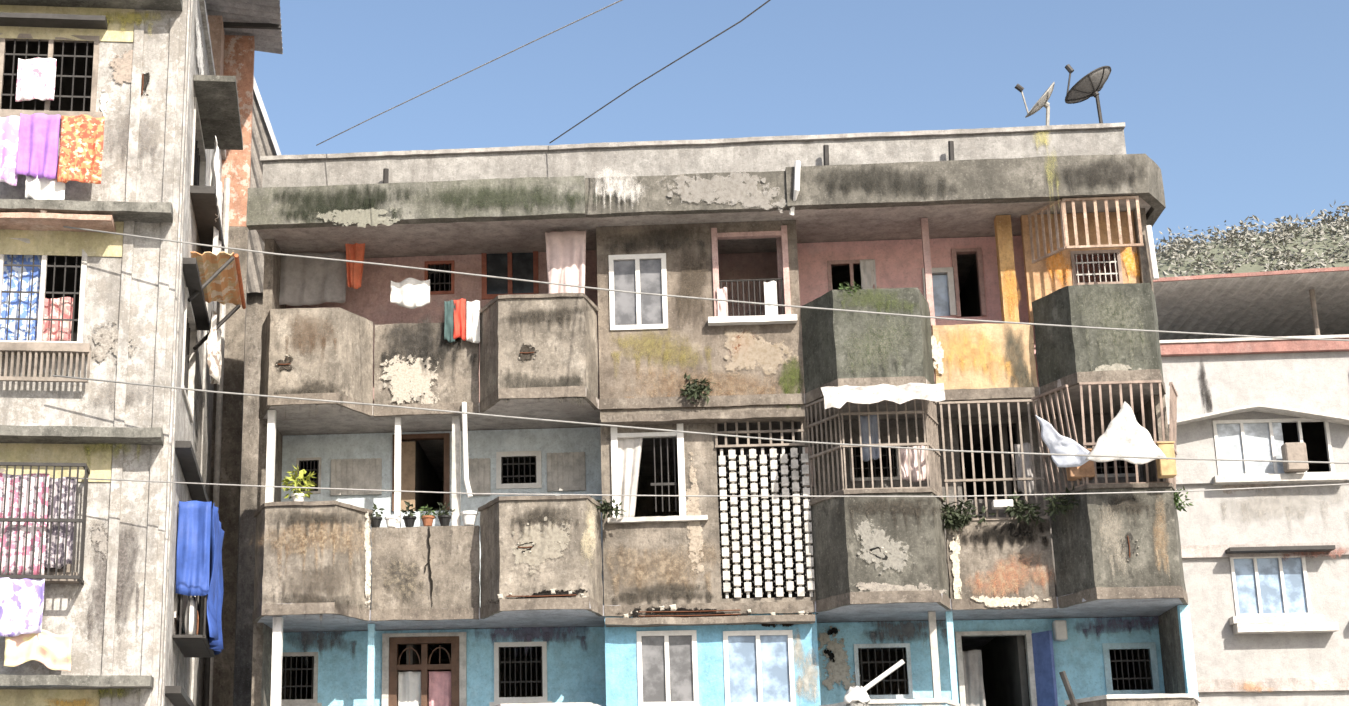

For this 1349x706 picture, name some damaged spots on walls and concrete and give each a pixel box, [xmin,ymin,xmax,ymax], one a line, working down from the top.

water stain [440,187,595,208]
peeling [595,169,791,213]
water stain [817,168,956,195]
peeling [377,354,441,405]
water stain [1006,329,1033,387]
water stain [962,522,1047,549]
crack [424,527,433,607]
peeling [854,519,1051,608]